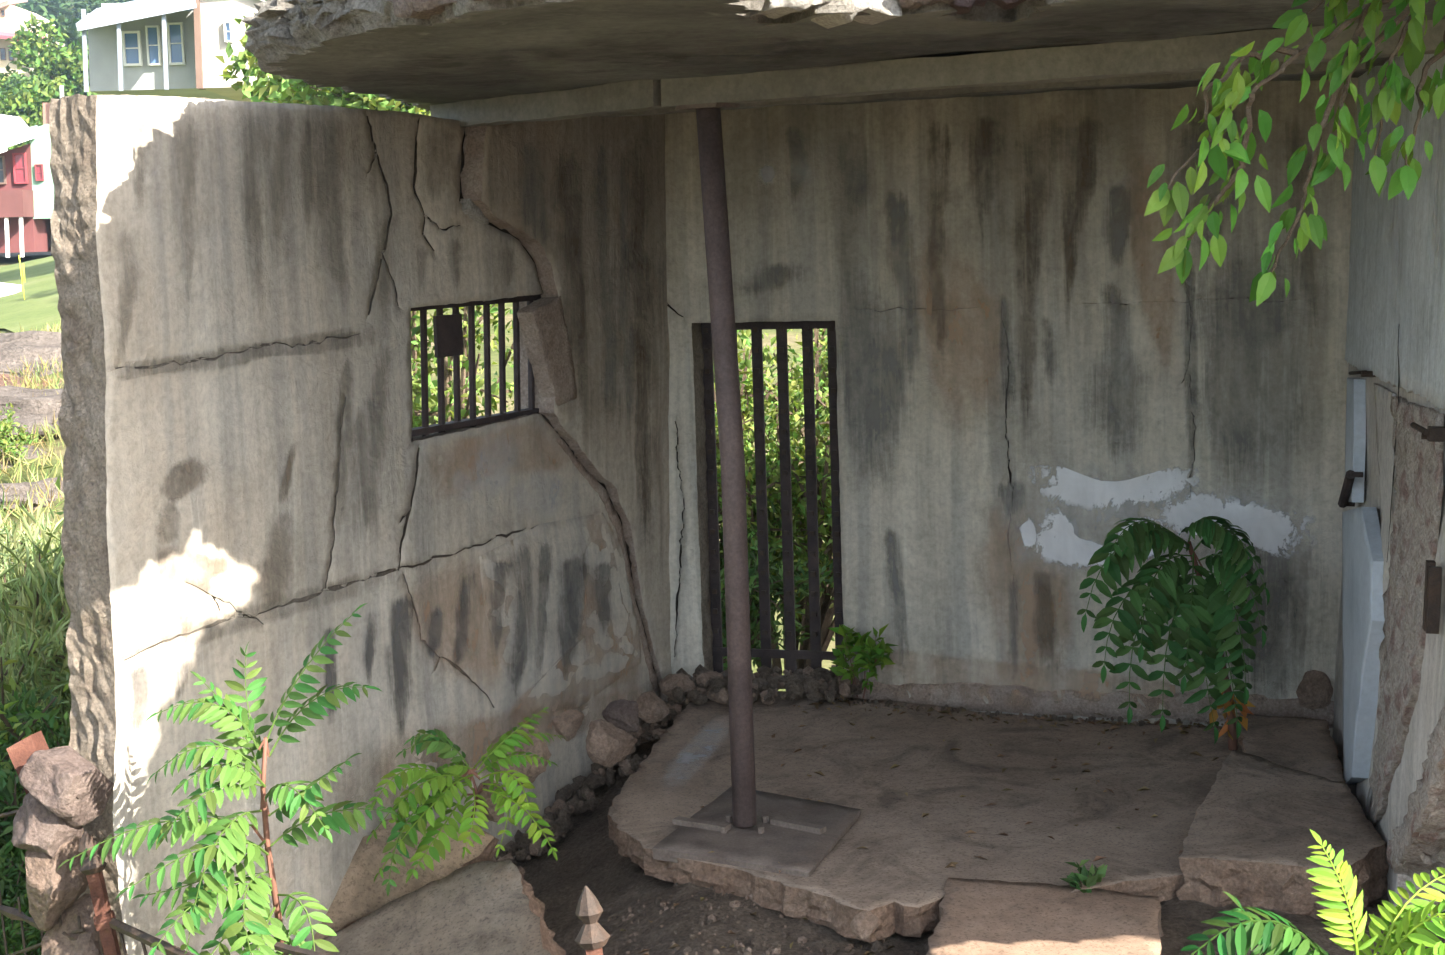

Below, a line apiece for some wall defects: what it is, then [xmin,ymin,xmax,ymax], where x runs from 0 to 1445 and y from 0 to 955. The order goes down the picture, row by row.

spalling [393,0,482,20]
spalling [750,0,1040,29]
water stain [1184,110,1235,183]
crack [366,116,543,315]
crack [186,582,264,625]
water stain [325,629,337,712]
water stain [366,598,413,729]
crack [398,447,494,708]
water stain [429,579,469,661]
water stain [494,547,610,692]
crack [541,414,685,692]
spalling [1368,396,1445,874]